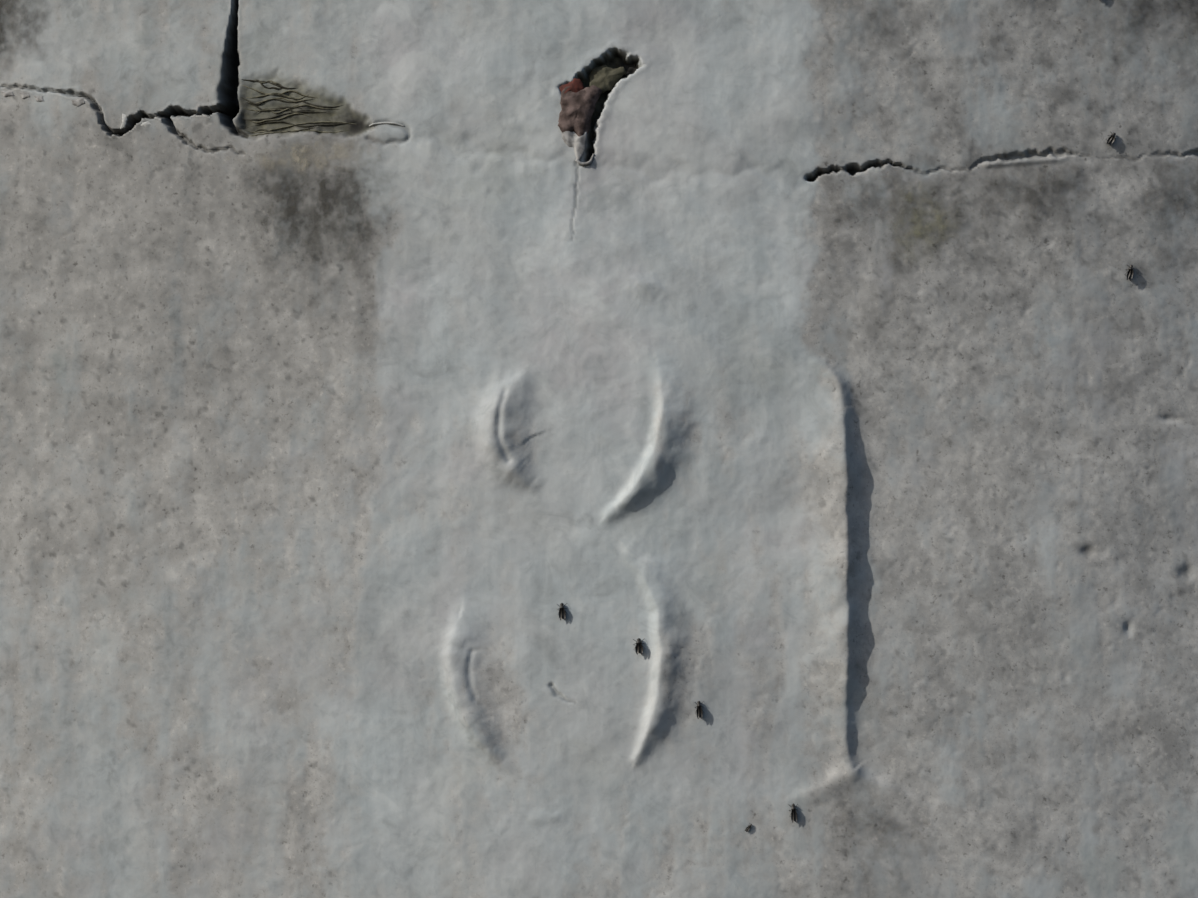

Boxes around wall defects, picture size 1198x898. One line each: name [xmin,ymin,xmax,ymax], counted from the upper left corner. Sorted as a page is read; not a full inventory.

crack [0,0,246,157]
spalling [233,67,413,146]
peeling [558,45,646,166]
leakage [319,179,353,217]
crack [804,149,1198,184]